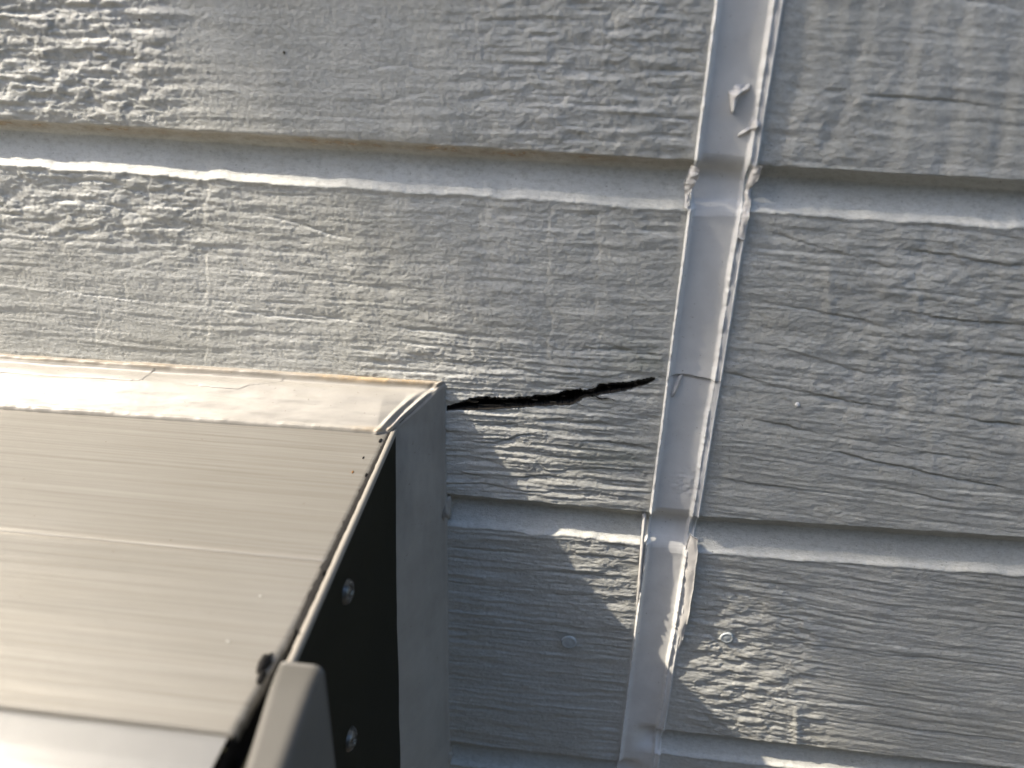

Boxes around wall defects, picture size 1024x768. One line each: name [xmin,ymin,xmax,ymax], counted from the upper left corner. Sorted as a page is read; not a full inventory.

crack [447,374,722,410]